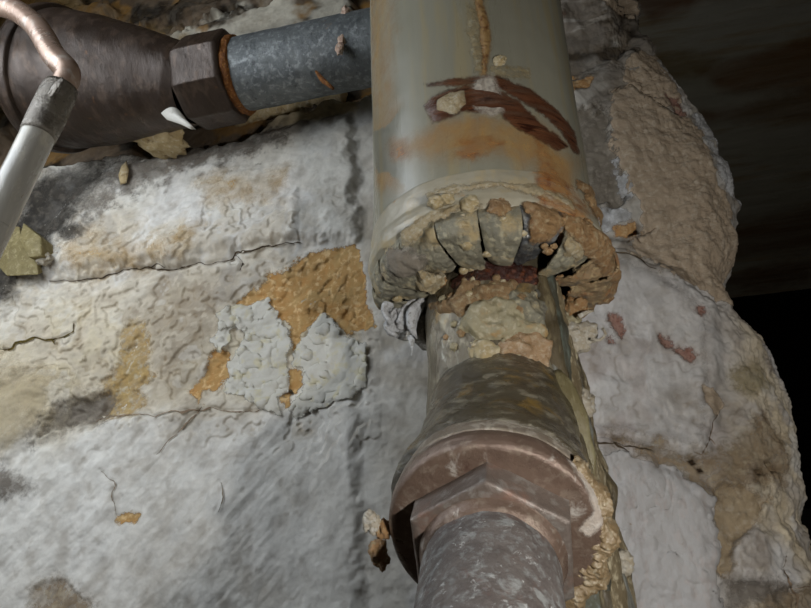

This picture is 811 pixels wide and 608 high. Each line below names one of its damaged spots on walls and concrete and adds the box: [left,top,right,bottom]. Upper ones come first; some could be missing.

rust [218,34,256,116]
rust [475,0,491,76]
crack [50,242,301,282]
rust [450,257,539,291]
crack [2,323,74,351]
peeling [190,244,377,420]
crack [96,407,270,454]
leakage [612,414,790,501]